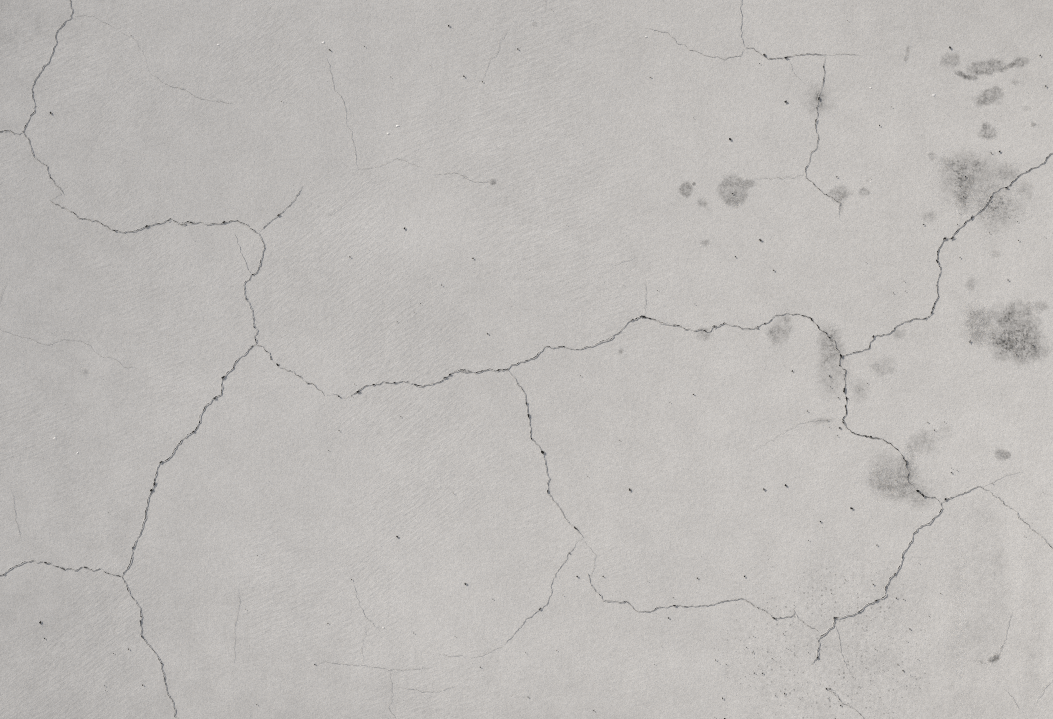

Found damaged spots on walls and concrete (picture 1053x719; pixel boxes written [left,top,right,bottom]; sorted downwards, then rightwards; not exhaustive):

crack [0,0,340,719]
crack [346,153,1053,672]
crack [649,0,857,206]
crack [828,688,864,719]